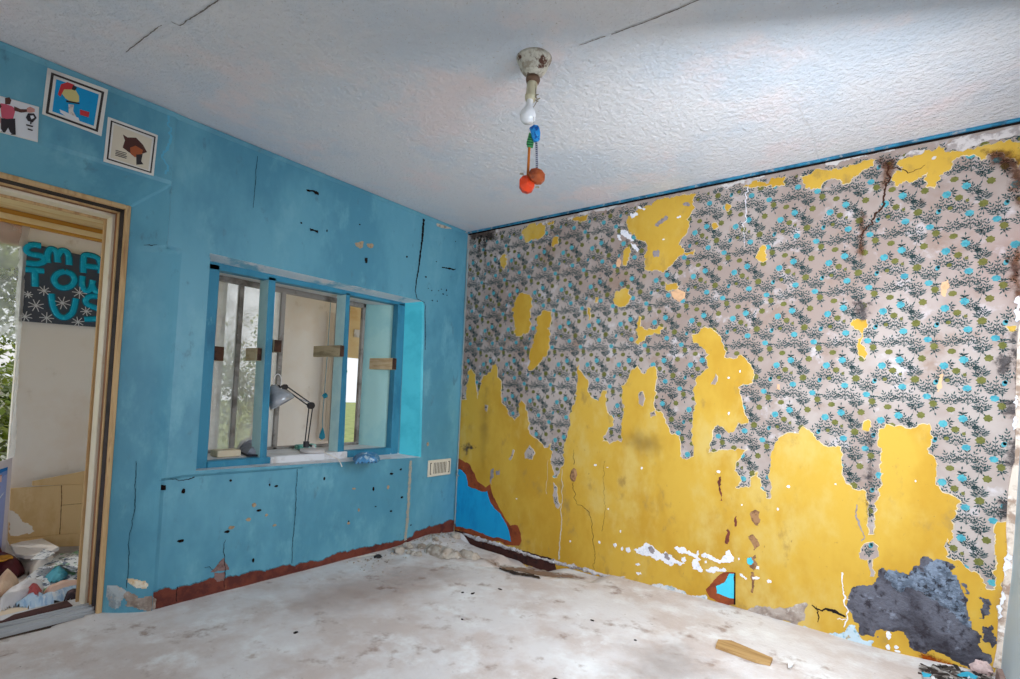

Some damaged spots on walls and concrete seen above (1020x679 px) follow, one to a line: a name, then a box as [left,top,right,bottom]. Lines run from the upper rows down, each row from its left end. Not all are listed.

crack [126,0,219,52]
crack [415,219,426,350]
peeling [567,193,696,292]
crack [860,165,925,246]
peeling [800,126,1020,190]
leakage [988,150,1020,205]
leakage [1008,250,1020,296]
peeling [512,292,552,371]
peeling [850,318,869,360]
crack [126,463,137,588]
peeling [106,326,1012,679]
crack [812,572,849,627]